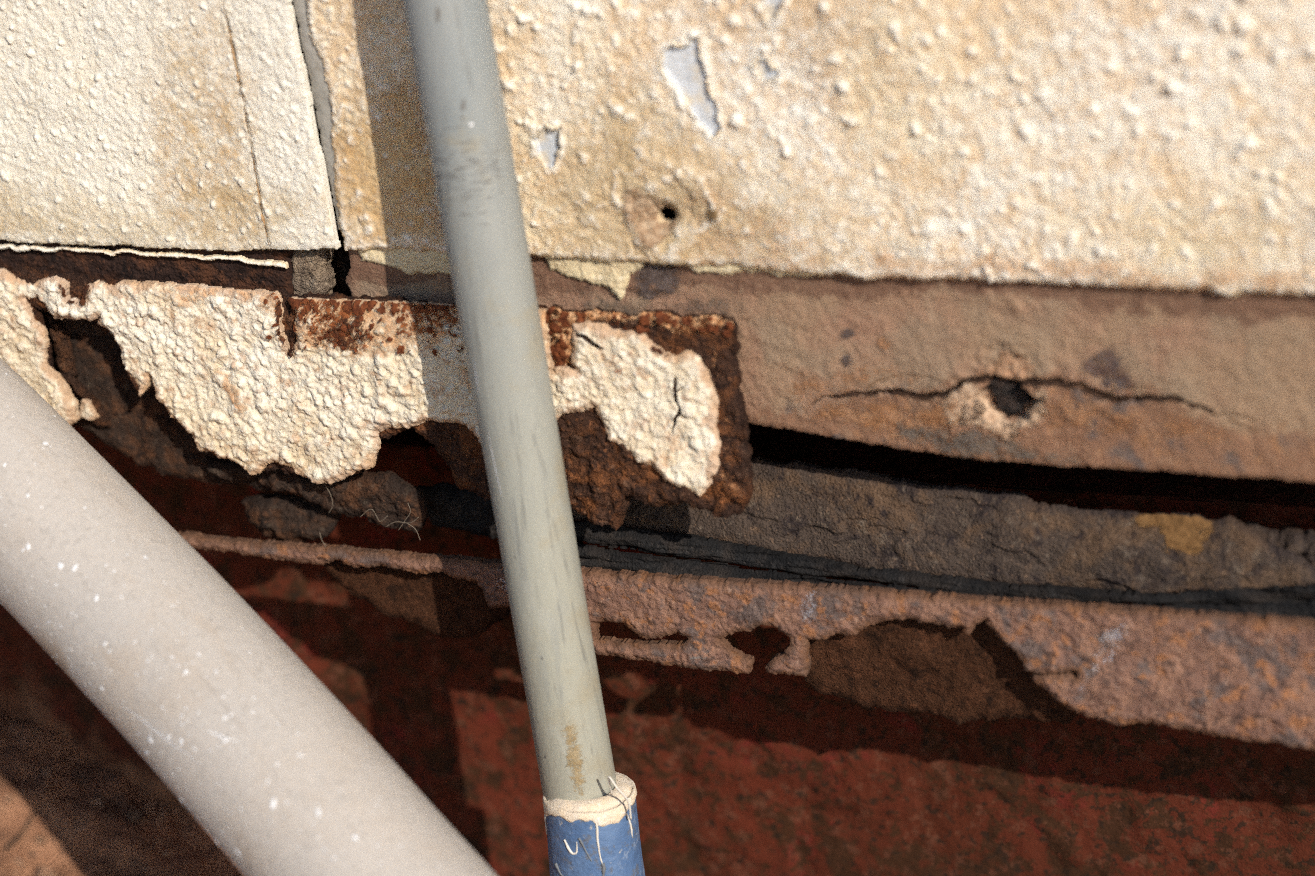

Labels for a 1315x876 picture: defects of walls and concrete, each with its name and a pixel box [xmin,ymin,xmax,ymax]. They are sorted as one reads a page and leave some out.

peeling [656,36,723,143]
peeling [531,123,561,170]
corrosion [237,290,471,389]
corrosion [541,307,734,367]
spalling [37,308,270,492]
crack [813,351,1260,432]
corrosion [571,445,1315,620]